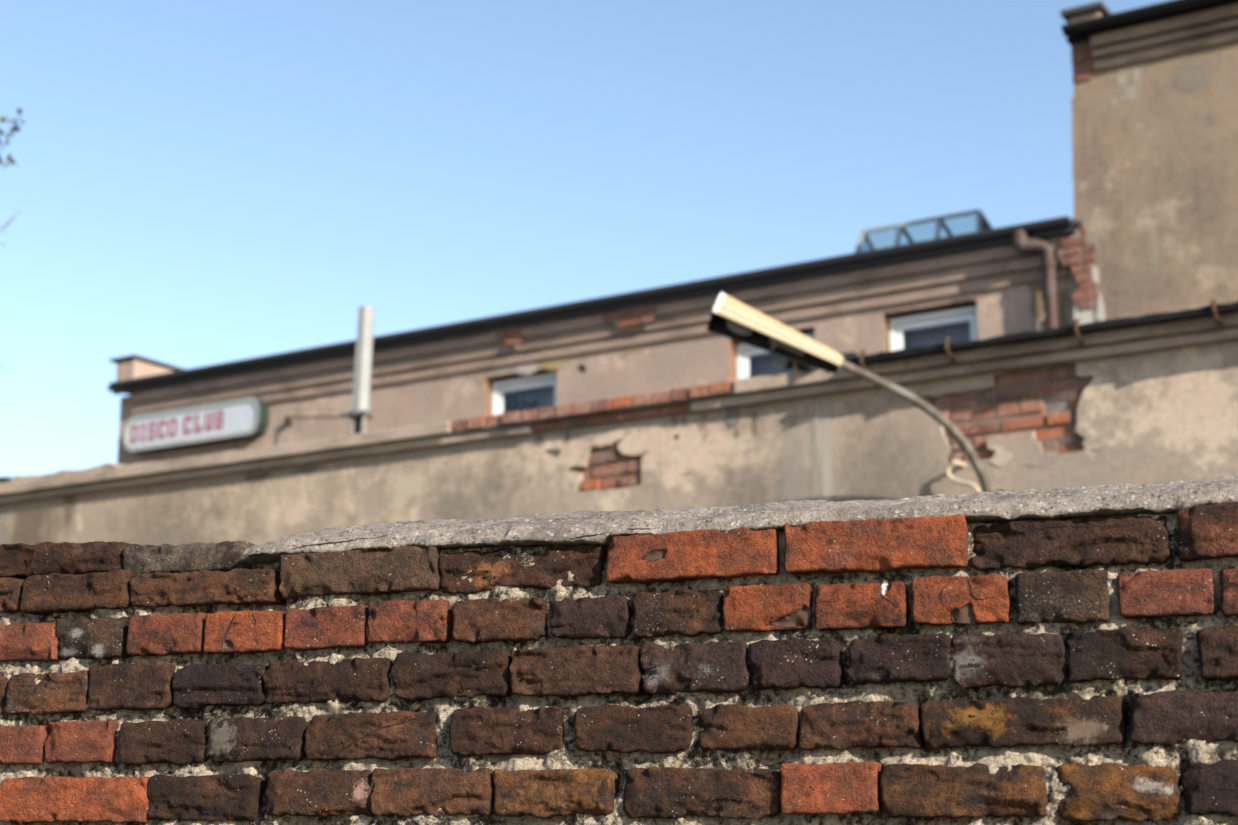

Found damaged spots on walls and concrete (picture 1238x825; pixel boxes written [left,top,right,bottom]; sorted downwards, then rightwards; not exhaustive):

spalling [1073,42,1095,82]
spalling [1029,226,1106,327]
spalling [725,408,740,427]
spalling [921,363,1093,464]
spalling [568,440,648,492]